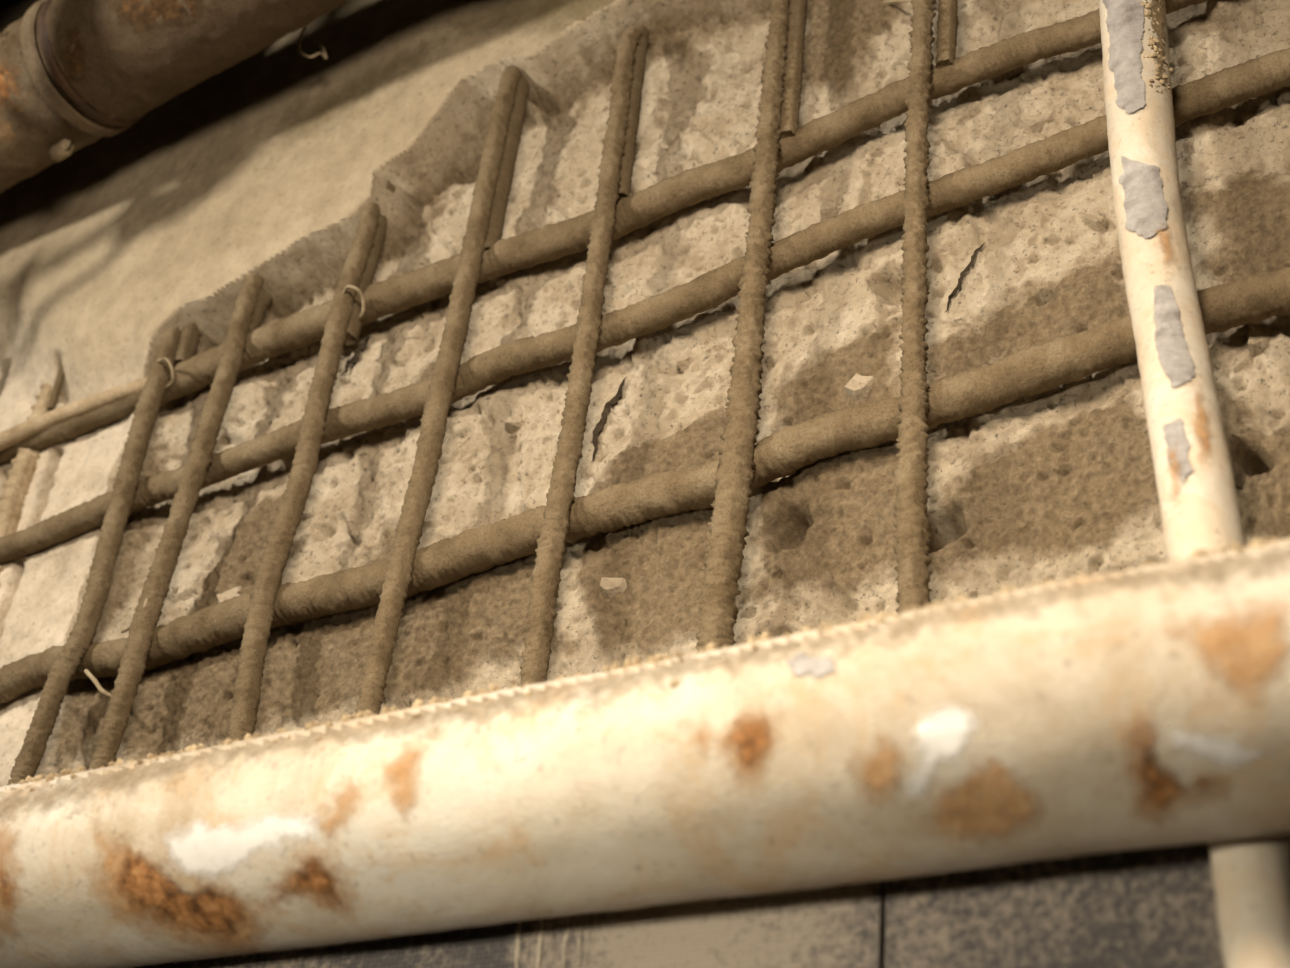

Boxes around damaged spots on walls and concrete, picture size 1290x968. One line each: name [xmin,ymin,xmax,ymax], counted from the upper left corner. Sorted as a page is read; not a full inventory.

crack [944,243,985,313]
spalling [1165,0,1290,545]
spalling [0,0,1195,795]
corrosion [1195,395,1210,451]
corrosion [1193,612,1287,689]
corrosion [386,752,418,810]
corrosion [723,721,771,774]
corrosion [863,746,897,792]
corrosion [936,761,1034,838]
corrosion [1132,723,1206,818]
peeling [1173,732,1262,765]
peeling [166,815,316,876]